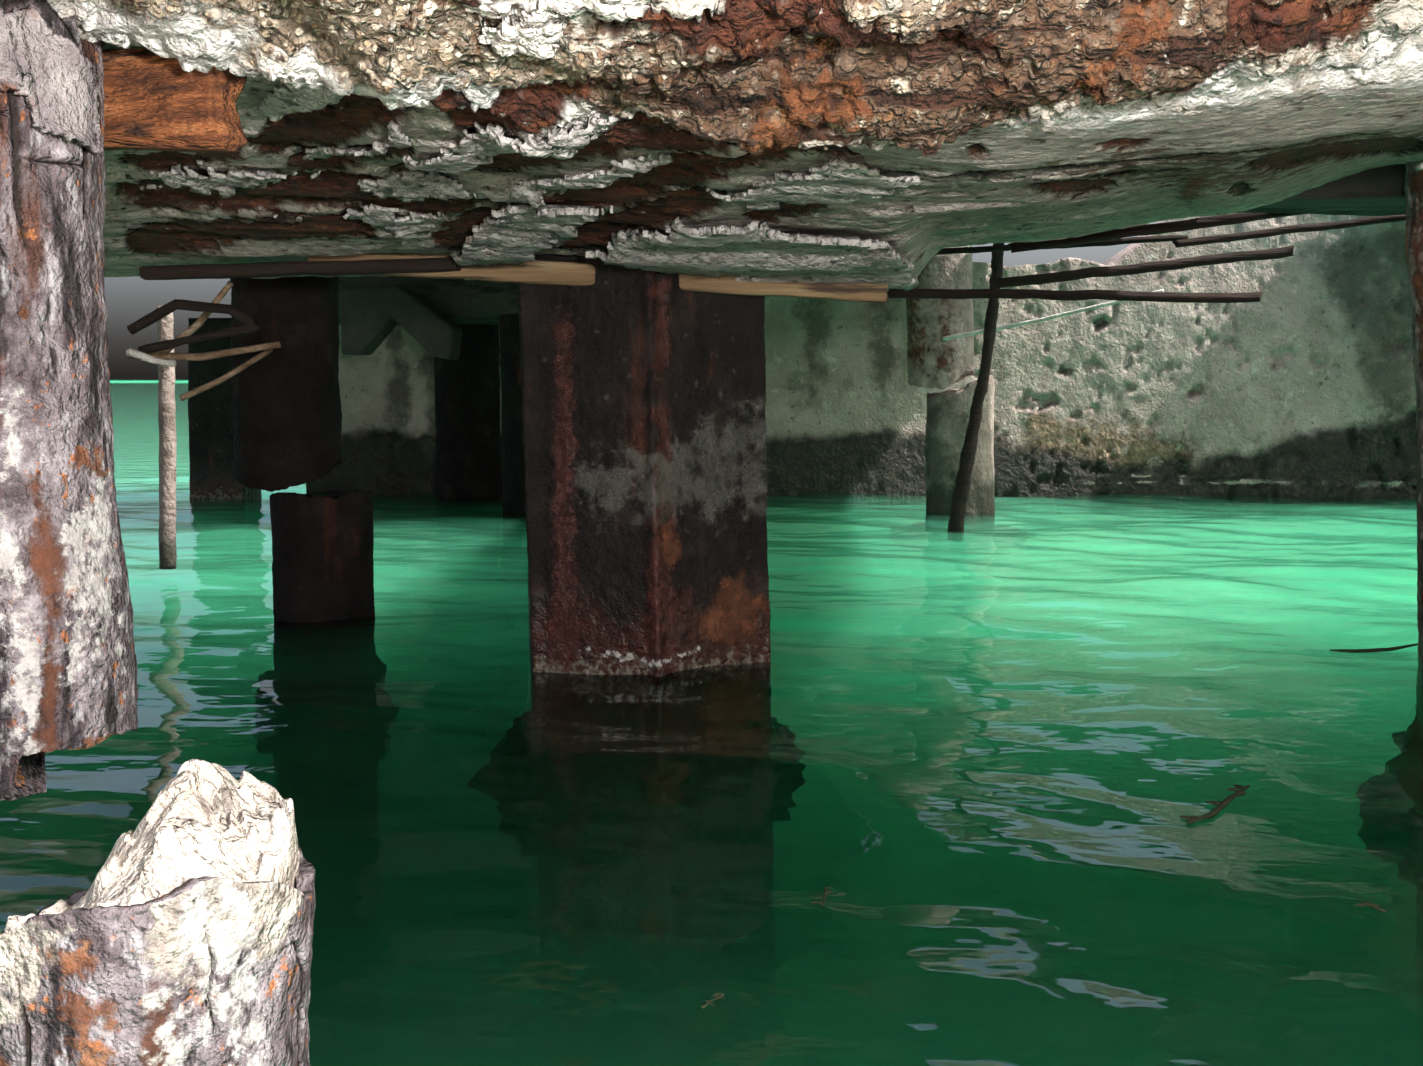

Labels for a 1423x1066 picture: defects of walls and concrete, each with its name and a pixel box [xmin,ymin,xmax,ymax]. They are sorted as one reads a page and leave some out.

crack [0,90,87,275]
peeling [0,0,103,154]
crack [48,2,79,47]
peeling [116,80,920,291]
peeling [476,0,651,60]
corrosion [598,0,900,156]
corrosion [1098,138,1148,150]
corrosion [645,279,770,682]
corrosion [29,473,66,753]
leakage [587,646,700,667]
corrosion [47,941,120,1066]
corrosion [140,989,176,1066]